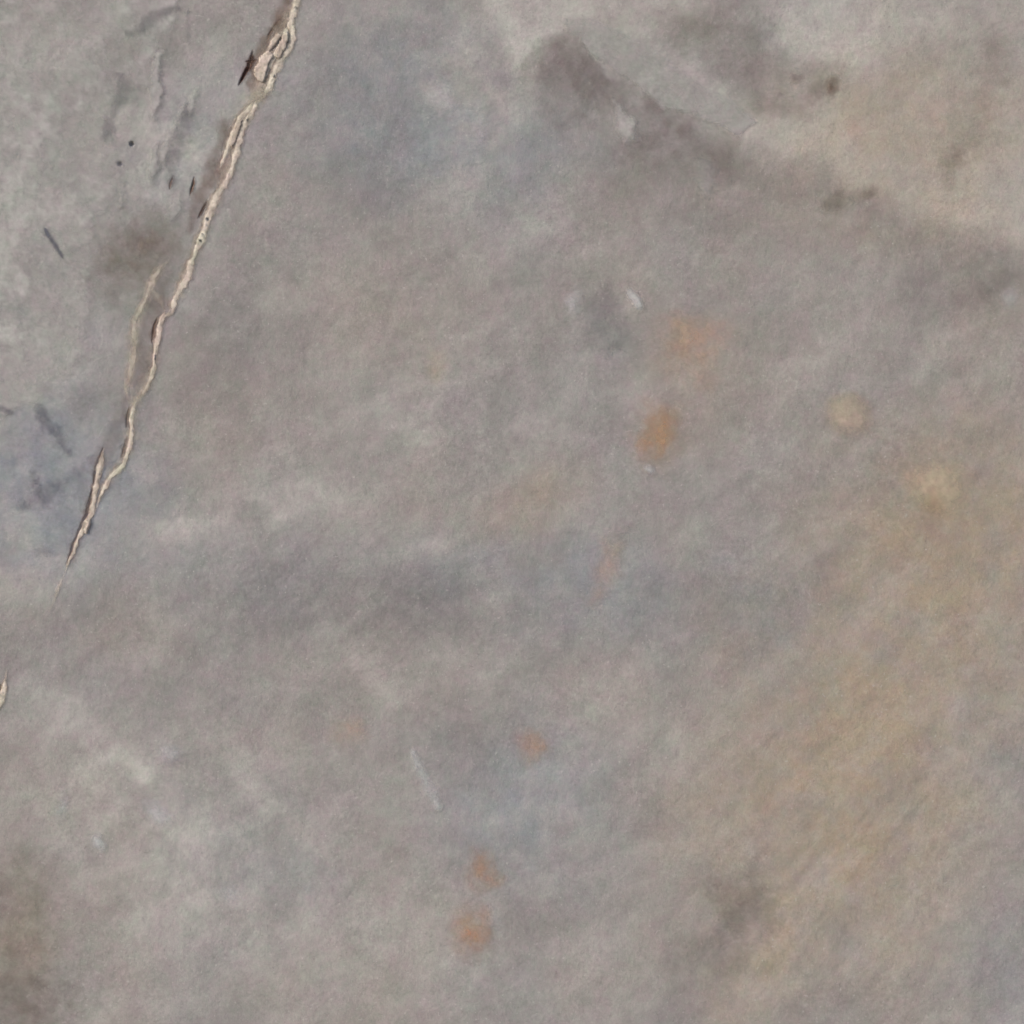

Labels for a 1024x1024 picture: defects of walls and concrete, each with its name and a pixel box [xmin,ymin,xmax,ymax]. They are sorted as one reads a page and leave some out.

crack [67,0,300,567]